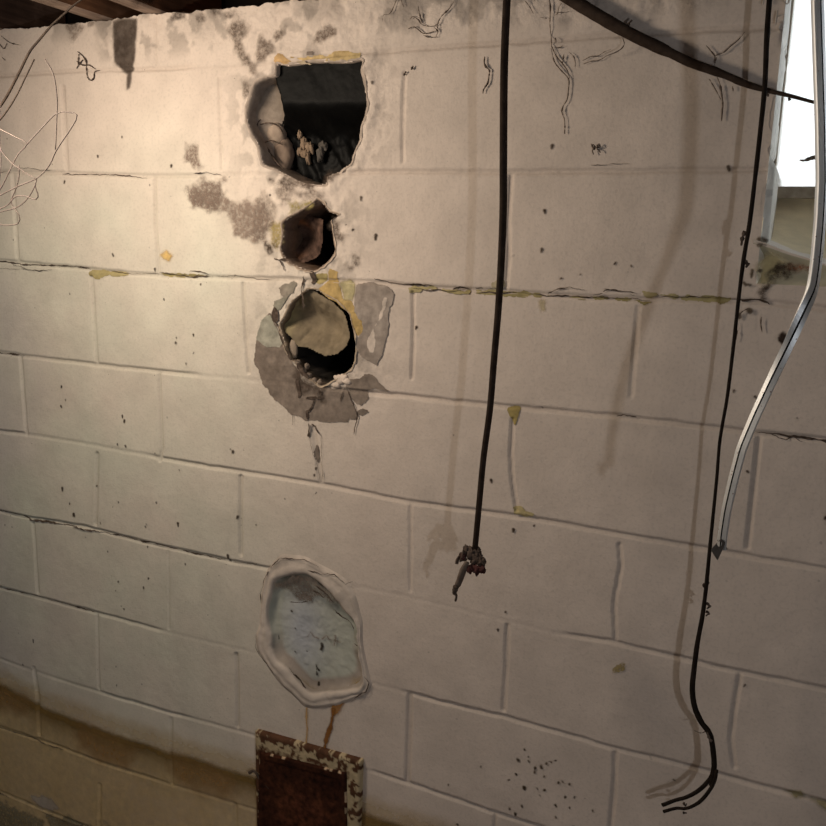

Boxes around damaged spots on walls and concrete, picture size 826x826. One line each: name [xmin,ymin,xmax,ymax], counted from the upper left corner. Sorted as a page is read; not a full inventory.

spalling [244,51,369,187]
spalling [254,198,394,423]
crack [375,279,716,301]
crack [741,298,770,306]
crack [755,432,826,443]
crack [0,510,255,565]
rust [323,703,343,748]
leakage [0,686,257,826]
leakage [362,815,398,826]